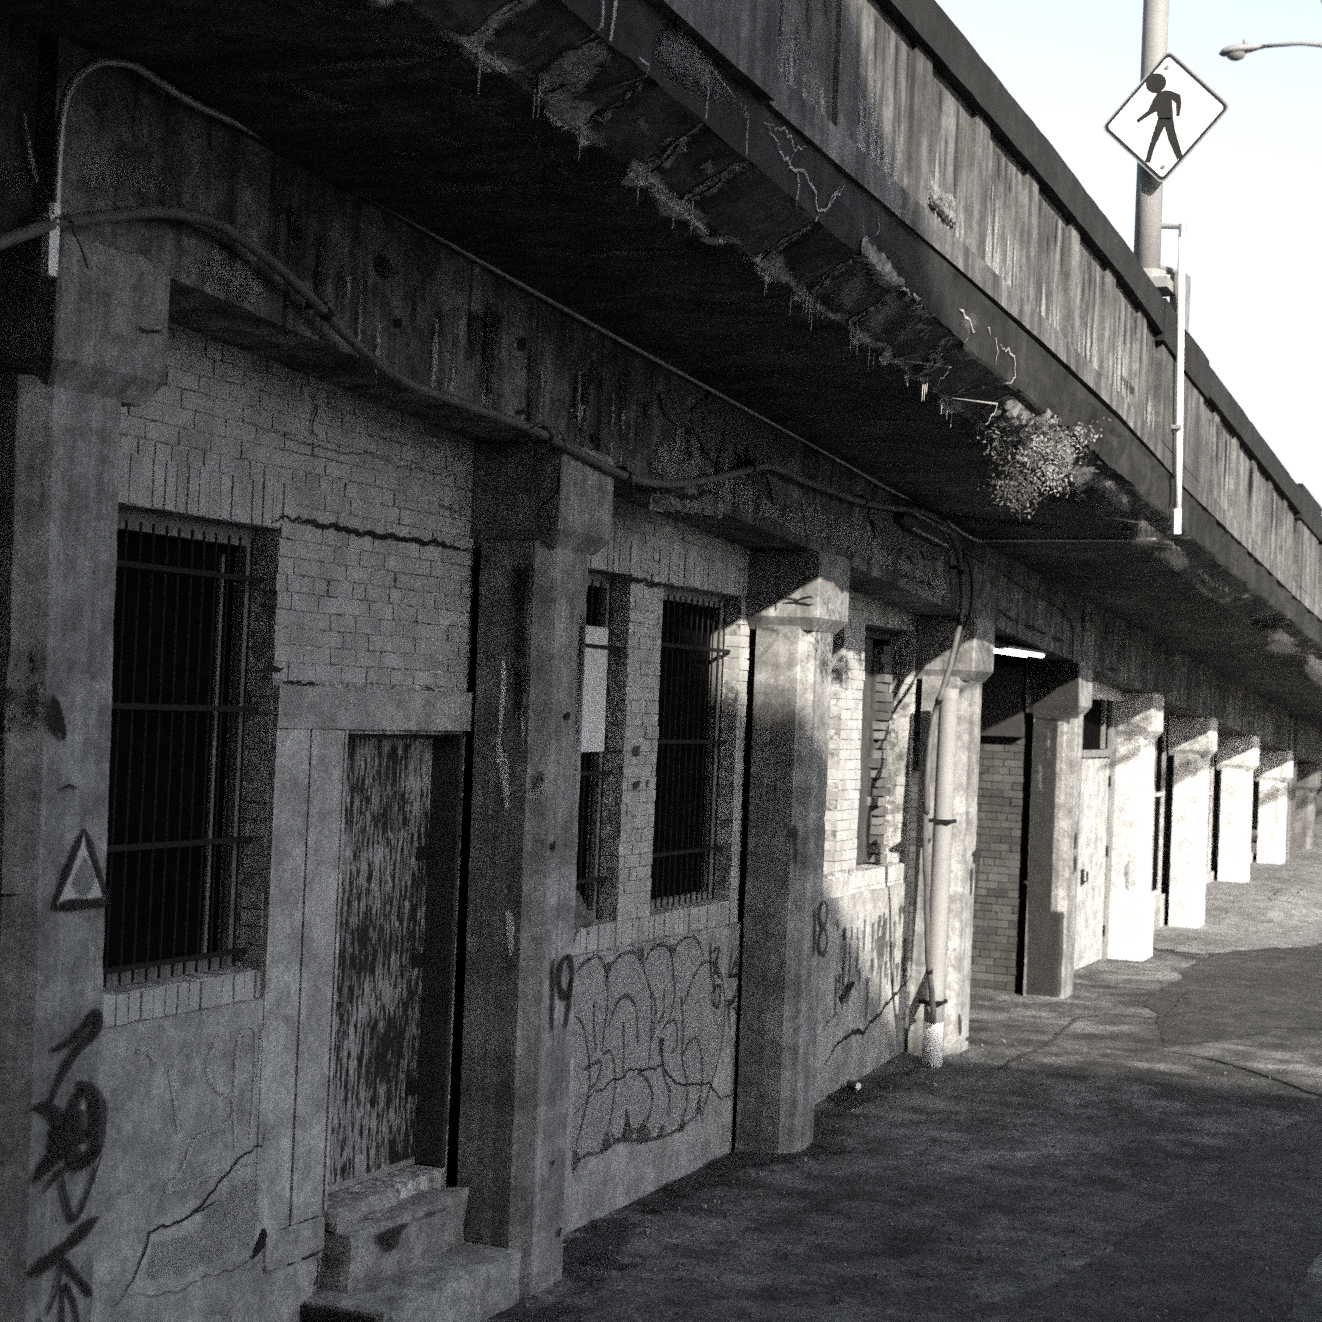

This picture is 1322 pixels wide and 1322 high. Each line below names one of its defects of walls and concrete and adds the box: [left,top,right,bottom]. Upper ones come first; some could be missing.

crack [443,0,880,323]
spalling [927,174,956,227]
peeling [853,235,915,291]
crack [849,288,1016,425]
crack [229,390,470,551]
spalling [999,409,1079,475]
crack [1042,464,1100,474]
spalling [1111,515,1188,568]
crack [825,975,911,1065]
crack [574,1064,737,1114]
crack [112,1129,329,1321]